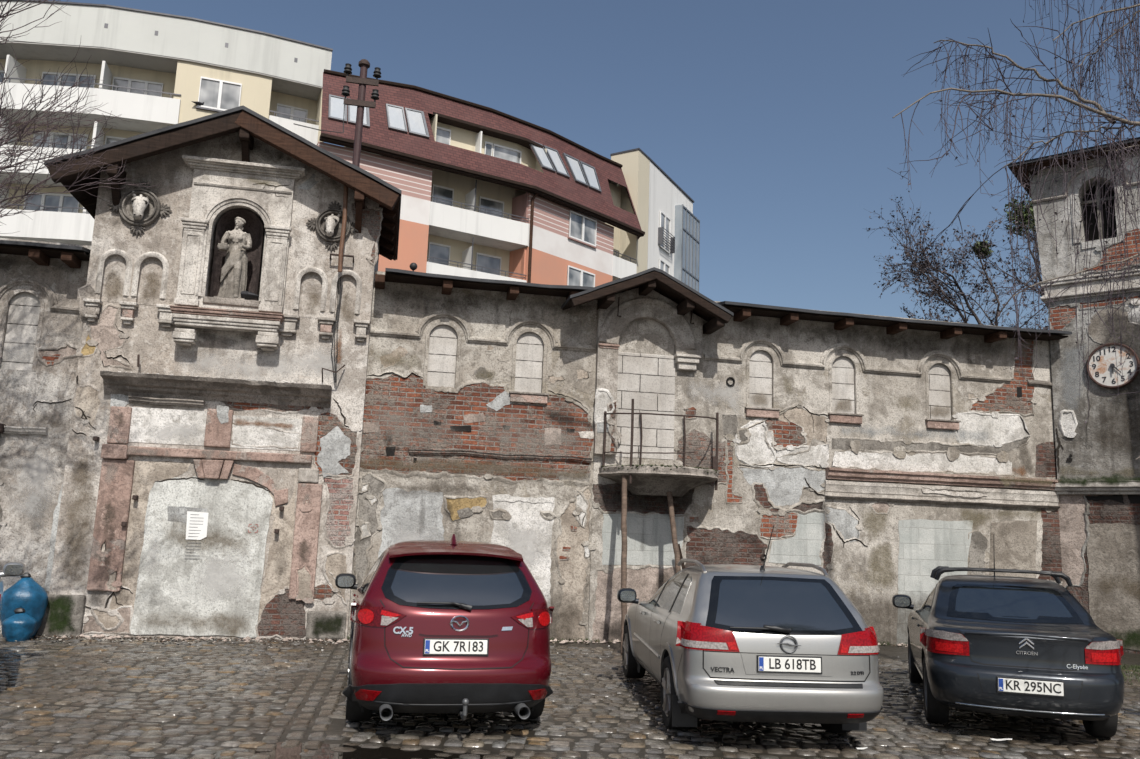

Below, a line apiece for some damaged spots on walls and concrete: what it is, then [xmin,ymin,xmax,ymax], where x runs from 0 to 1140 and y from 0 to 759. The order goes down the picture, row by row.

flaking render [1081,228,1140,275]
crack [33,375,96,435]
flaking render [217,338,1057,642]